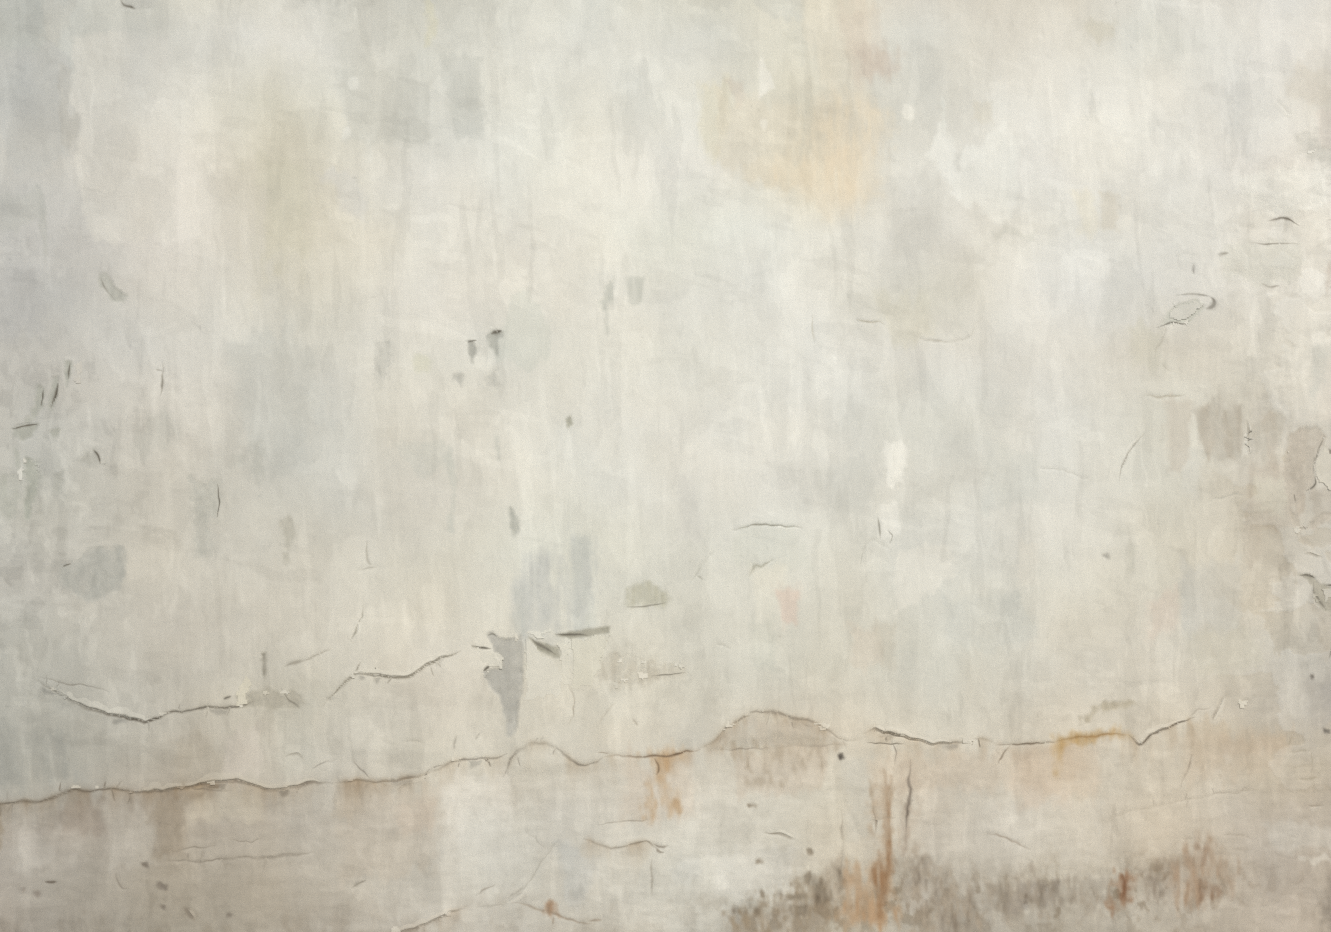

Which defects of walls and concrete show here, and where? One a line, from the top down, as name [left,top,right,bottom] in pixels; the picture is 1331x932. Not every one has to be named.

peeling [1156,292,1220,328]
peeling [1281,425,1331,534]
peeling [1295,571,1331,615]
peeling [476,625,696,739]
crack [0,675,1226,880]
crack [44,878,57,886]
leakage [728,862,848,919]
corrosion [828,850,905,932]
leakage [863,777,1010,932]
leakage [1034,873,1079,915]
leakage [1314,873,1331,932]